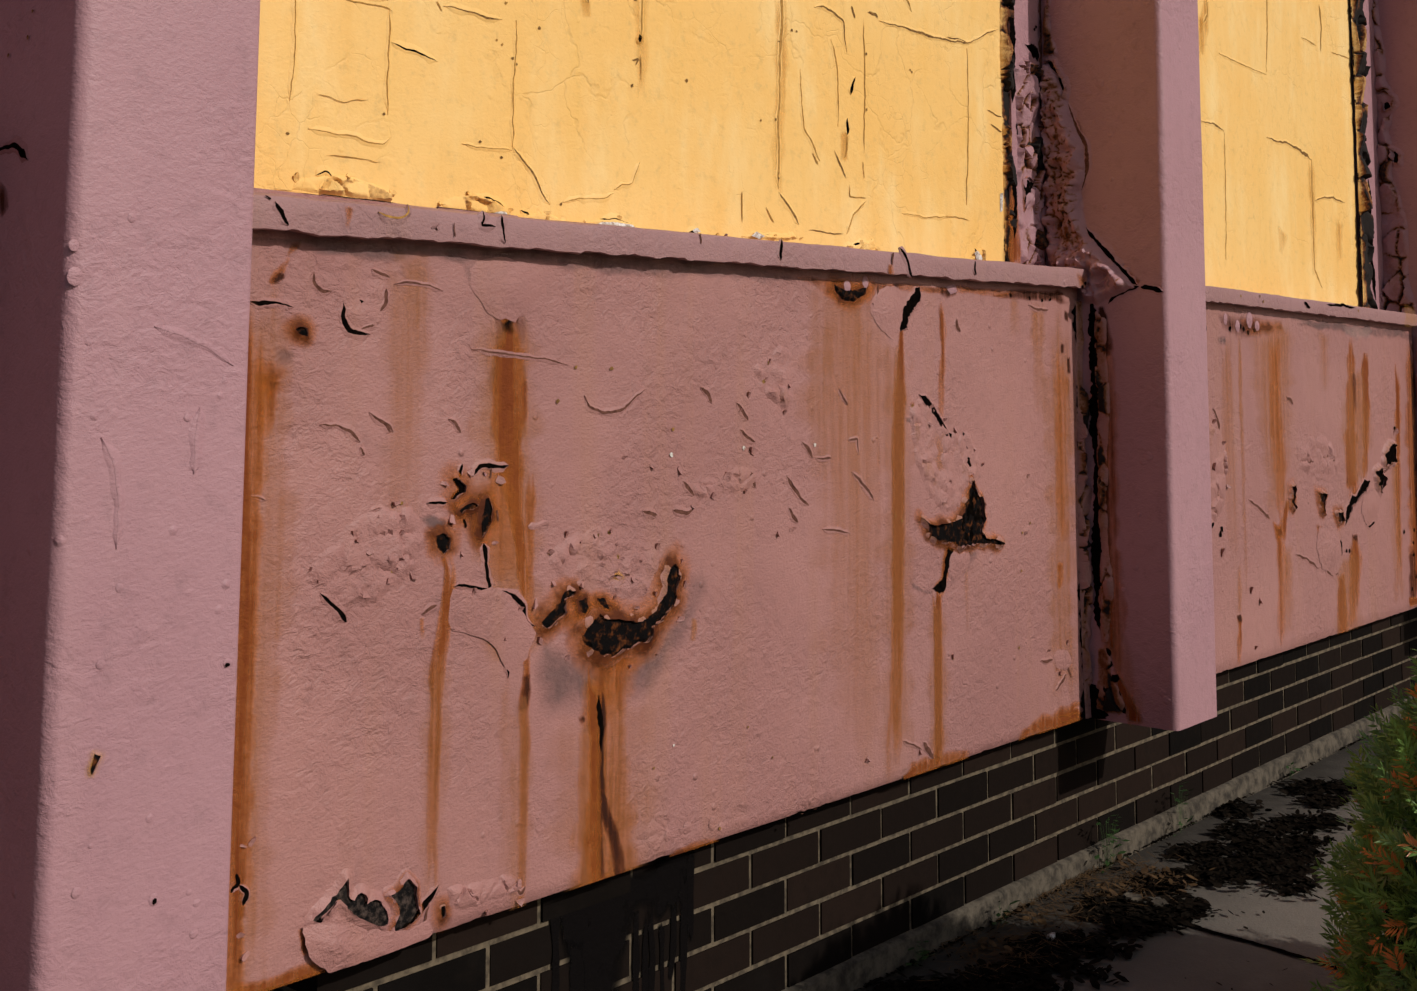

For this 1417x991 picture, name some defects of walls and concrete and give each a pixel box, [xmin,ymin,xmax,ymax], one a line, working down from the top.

rust [227,330,323,991]
crack [286,0,438,163]
rust [426,319,567,829]
crack [436,1,640,243]
rust [535,552,686,887]
crack [741,0,1018,332]
rust [892,330,1005,779]
peeling [895,393,1005,552]
peeling [1014,0,1141,722]
crack [1267,136,1376,312]
peeling [1372,0,1417,314]
peeling [304,868,527,933]